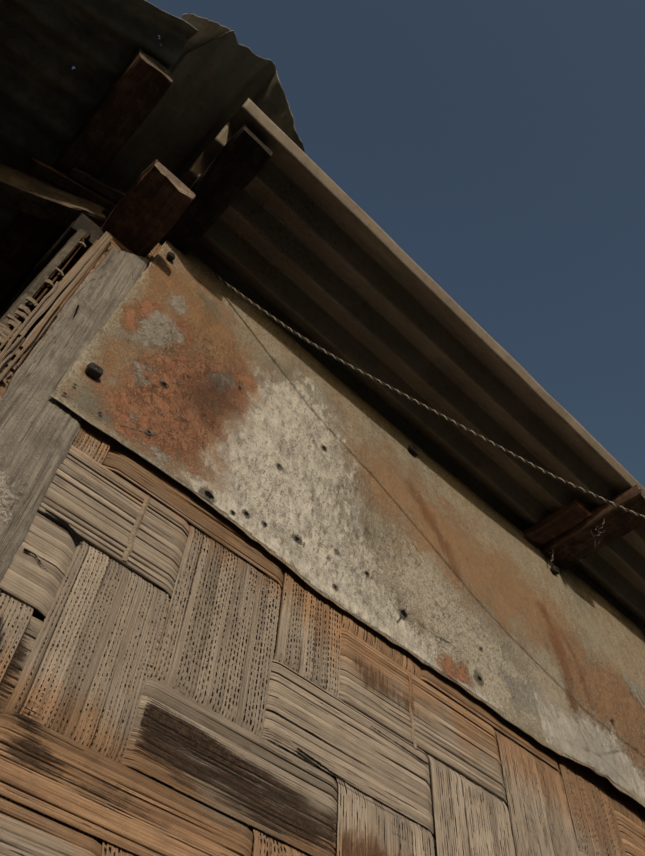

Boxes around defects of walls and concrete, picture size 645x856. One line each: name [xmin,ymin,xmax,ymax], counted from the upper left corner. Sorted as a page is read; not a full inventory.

rust [91,257,258,474]
damp [0,622,33,701]
damp [134,697,387,856]